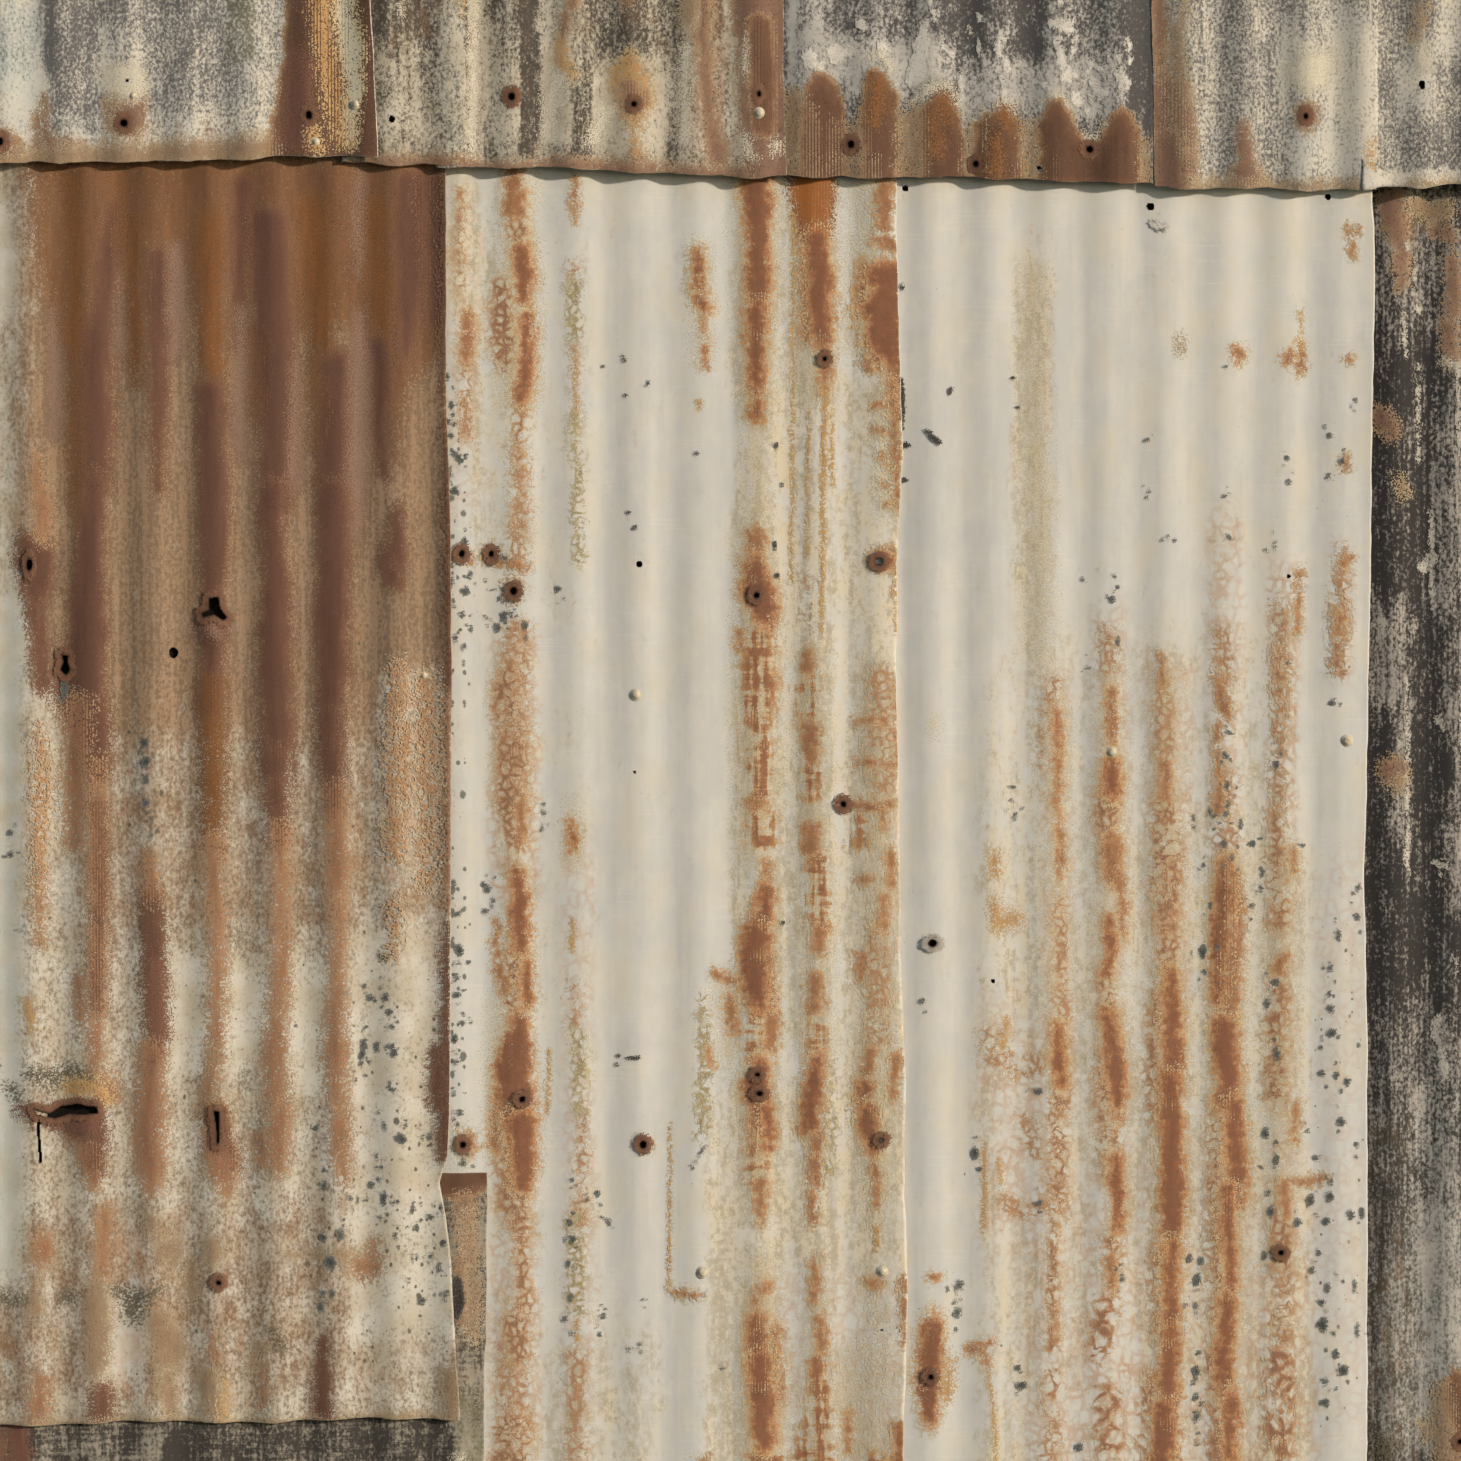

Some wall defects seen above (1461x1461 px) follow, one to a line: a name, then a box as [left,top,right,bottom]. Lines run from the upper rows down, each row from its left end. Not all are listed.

corrosion [1342,170,1461,376]
peeling [1400,239,1423,360]
corrosion [559,254,591,570]
corrosion [1372,401,1405,448]
peeling [1417,553,1440,580]
corrosion [842,654,905,1253]
corrosion [971,540,1360,1461]
peeling [1430,857,1451,878]
corrosion [0,1112,460,1461]
corrosion [440,1172,487,1349]
corrosion [554,974,601,1461]
corrosion [729,1246,1002,1461]